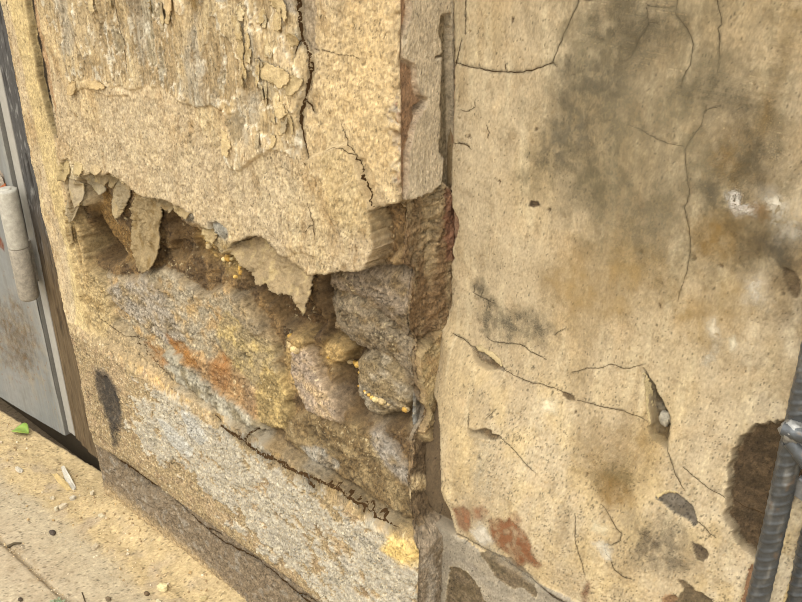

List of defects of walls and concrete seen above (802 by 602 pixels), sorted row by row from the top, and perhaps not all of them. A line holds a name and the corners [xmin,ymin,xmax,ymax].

crack [295,0,359,164]
crack [438,0,579,184]
crack [333,124,388,208]
leakage [562,0,802,289]
spalling [56,0,460,602]
leakage [483,313,521,338]
spalling [642,372,671,441]
rust [454,508,481,530]
rust [490,518,540,566]
crack [601,504,631,579]
spalling [727,421,784,552]
spalling [665,580,713,602]